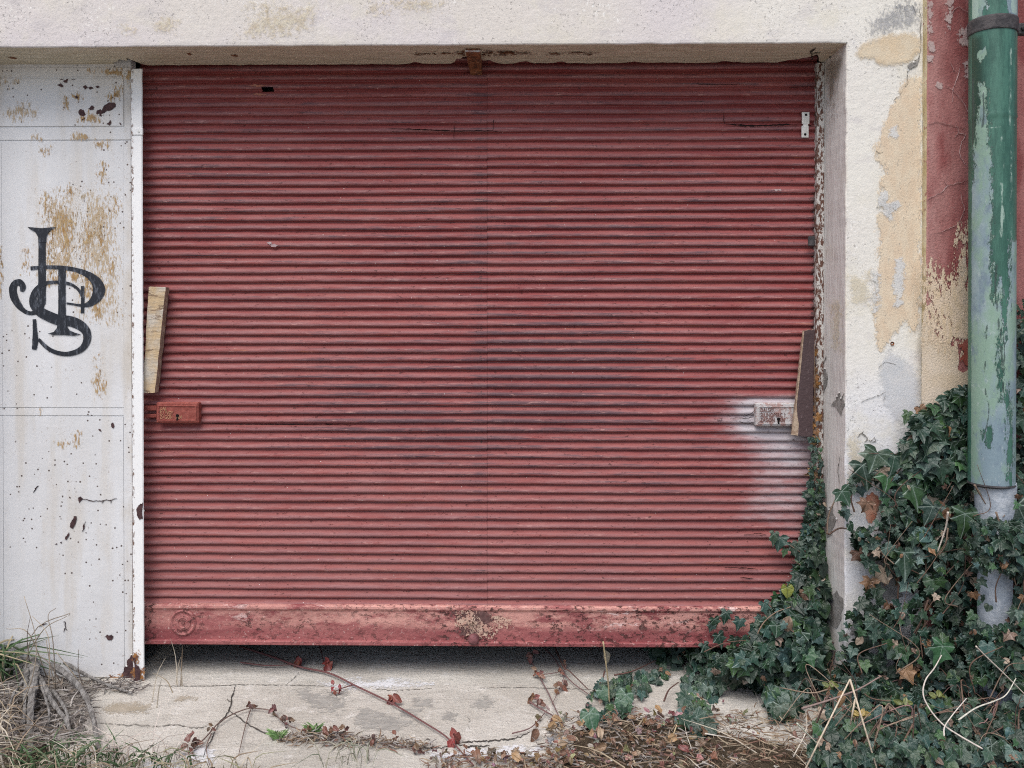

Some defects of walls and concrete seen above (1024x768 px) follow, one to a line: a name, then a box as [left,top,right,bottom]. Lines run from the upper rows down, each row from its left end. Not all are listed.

rust [87,68,131,102]
rust [63,92,109,149]
rust [20,161,123,326]
peeling [850,33,968,407]
rust [109,652,145,681]